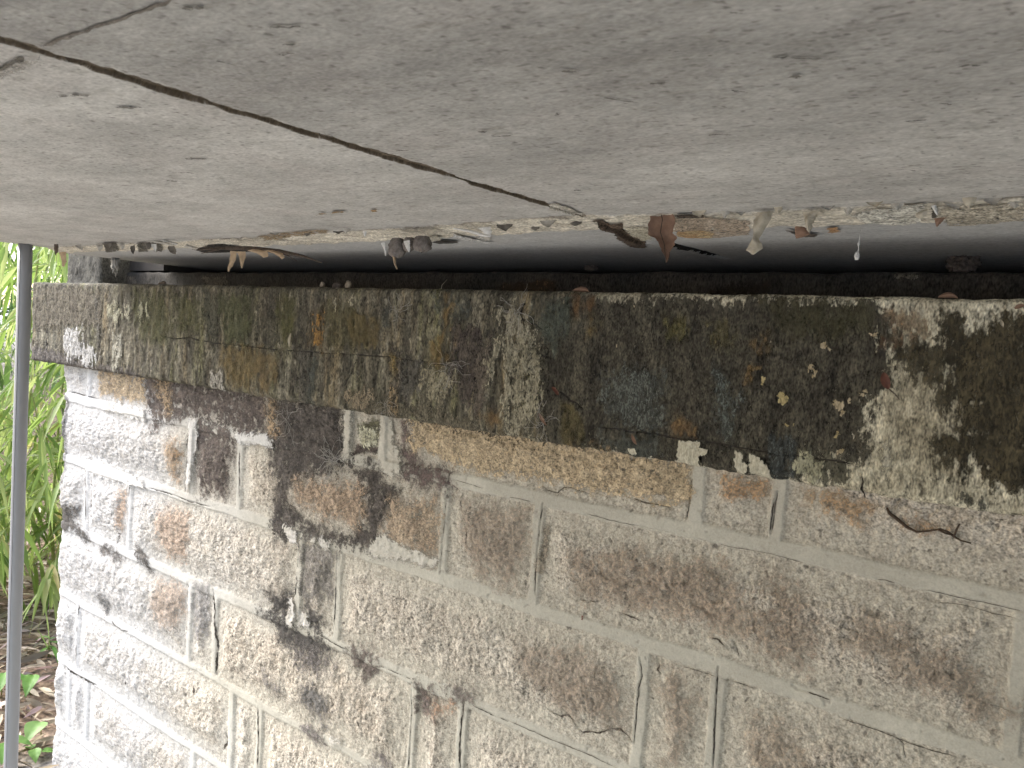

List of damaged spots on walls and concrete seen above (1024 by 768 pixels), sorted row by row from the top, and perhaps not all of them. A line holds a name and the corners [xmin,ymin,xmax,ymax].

crack [0,0,228,107]
crack [368,148,473,182]
peeling [75,240,198,254]
peeling [425,224,513,244]
spalling [529,203,652,248]
peeling [673,210,750,238]
peeling [821,197,1024,226]
damp [63,327,97,368]
damp [94,297,150,373]
damp [478,296,584,454]
damp [144,365,466,559]
damp [254,585,380,751]